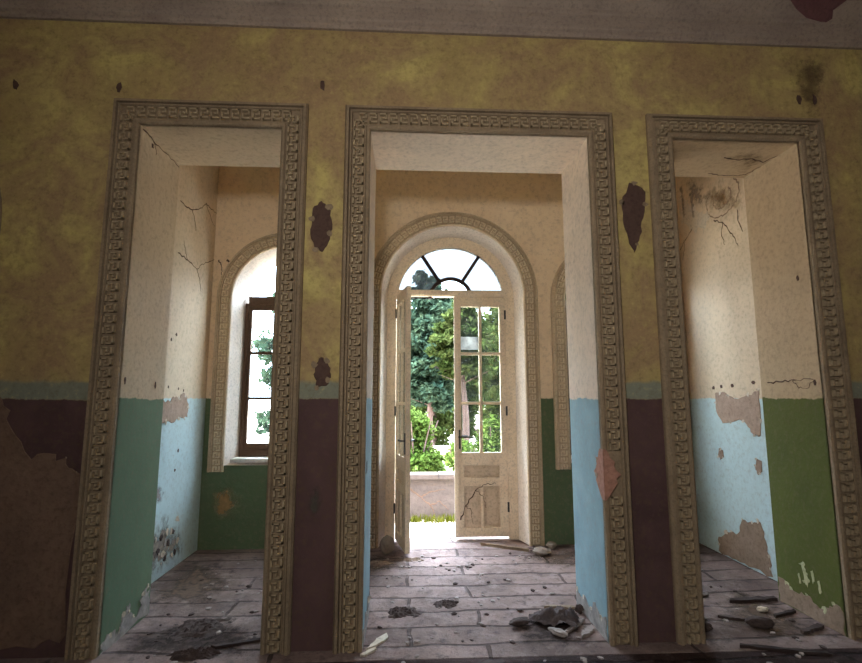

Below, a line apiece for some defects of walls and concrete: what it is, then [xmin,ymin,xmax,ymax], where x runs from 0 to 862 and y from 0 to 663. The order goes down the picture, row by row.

crack [180,200,216,227]
flaking render [308,201,334,252]
flaking render [619,181,649,253]
crack [714,210,743,245]
crack [178,245,230,290]
peeling [162,392,189,425]
peeling [714,388,762,437]
peeling [152,516,179,569]
flaking render [718,518,846,636]
flaking render [100,583,150,654]